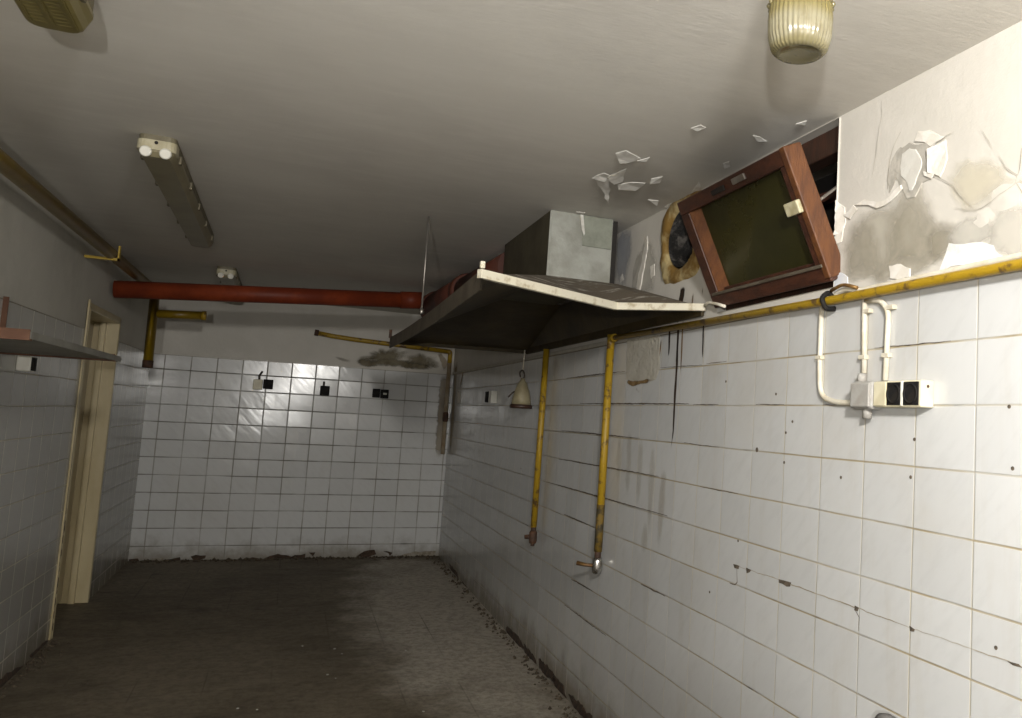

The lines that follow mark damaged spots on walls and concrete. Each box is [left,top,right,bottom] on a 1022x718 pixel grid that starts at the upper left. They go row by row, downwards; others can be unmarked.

peeling [593,150,663,201]
flaking render [833,130,948,245]
leakage [849,190,1022,281]
leakage [358,350,463,451]